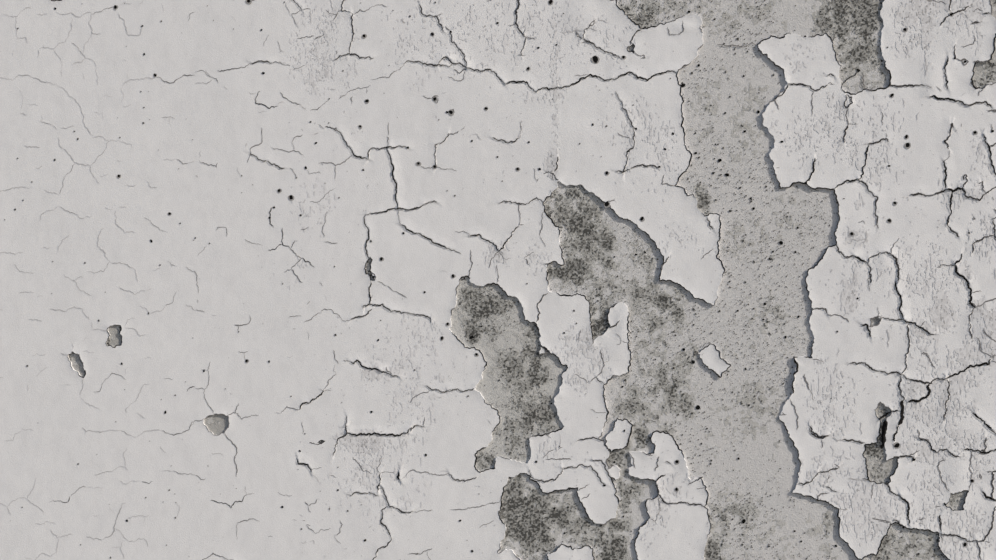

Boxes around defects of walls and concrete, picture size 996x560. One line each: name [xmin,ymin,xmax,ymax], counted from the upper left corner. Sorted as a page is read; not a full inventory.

spalling [971,34,996,89]
spalling [450,0,950,560]
crack [774,0,996,559]
spalling [106,325,122,348]
spalling [67,351,86,378]
spalling [203,414,229,436]
crack [628,451,705,523]